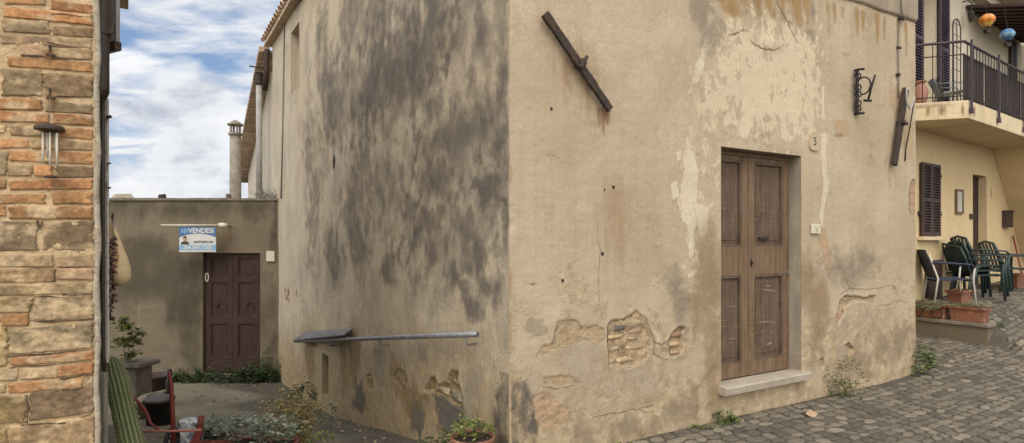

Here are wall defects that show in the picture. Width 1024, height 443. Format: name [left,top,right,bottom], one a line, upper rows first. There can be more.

water stain [317,0,445,142]
peeling [669,0,842,279]
water stain [463,279,497,318]
spalling [539,310,652,368]
spalling [668,327,686,357]
spalling [836,295,875,325]
spalling [393,369,463,437]